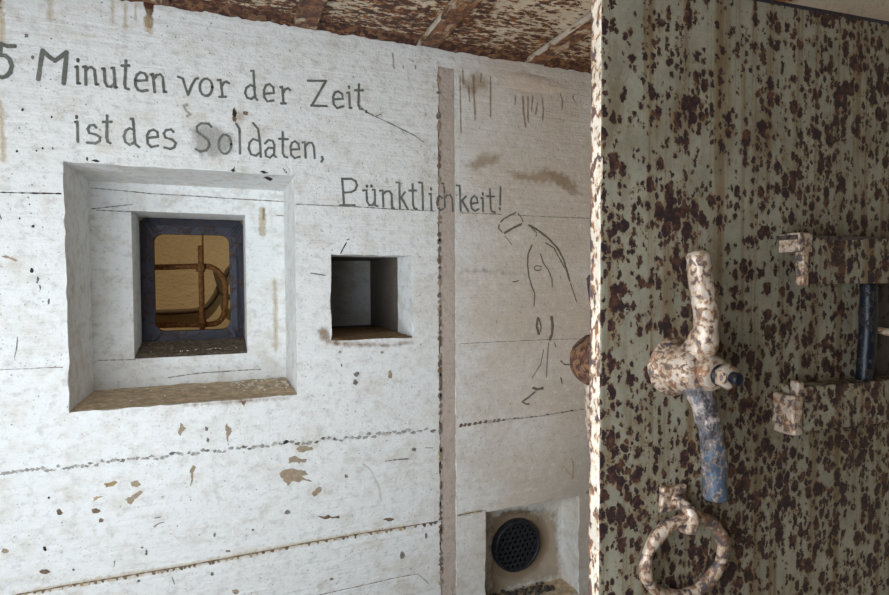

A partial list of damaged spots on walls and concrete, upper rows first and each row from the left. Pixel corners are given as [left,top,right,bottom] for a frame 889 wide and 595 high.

rust [120,0,420,46]
rust [437,40,530,62]
rust [544,58,591,74]
water stain [460,74,491,131]
peeling [0,214,442,585]